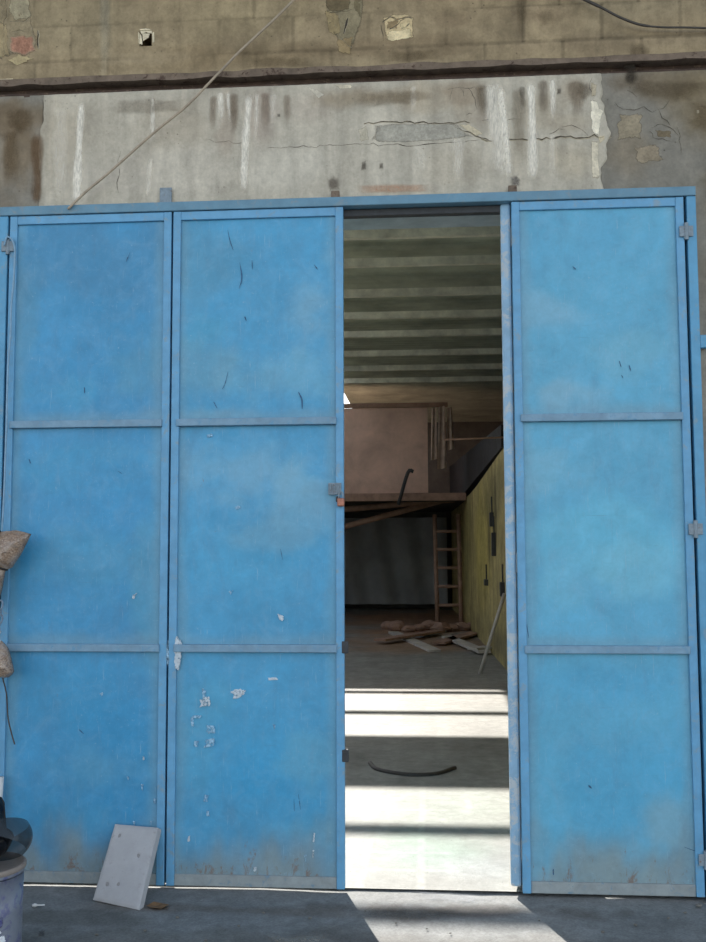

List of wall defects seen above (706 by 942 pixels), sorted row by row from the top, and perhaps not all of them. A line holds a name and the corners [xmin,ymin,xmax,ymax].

peeling [326,0,360,16]
spalling [381,14,413,41]
damp [211,94,251,184]
crack [209,87,611,148]
damp [480,88,510,169]
damp [528,80,555,175]
spalling [591,83,605,178]